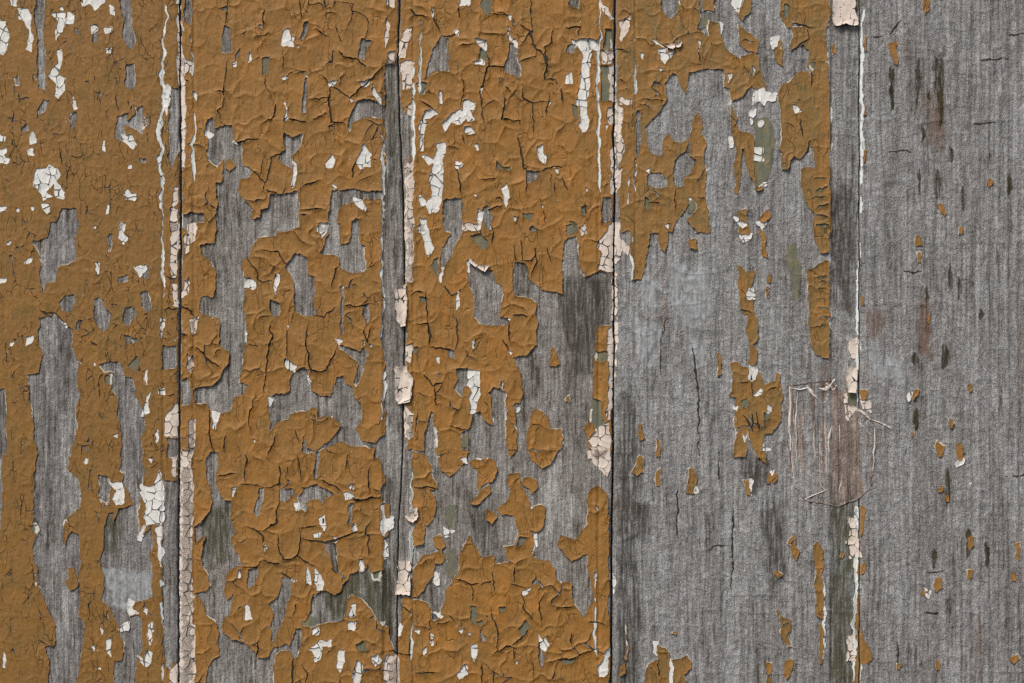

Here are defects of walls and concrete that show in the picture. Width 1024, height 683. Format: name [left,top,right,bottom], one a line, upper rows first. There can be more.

crack [217,57,228,123]
crack [238,0,383,194]
crack [302,180,322,210]
peeling [614,0,833,358]
peeling [852,0,867,213]
peeling [0,0,620,683]
peeling [717,265,783,484]
crack [209,410,382,618]
crack [389,639,437,674]
crack [456,567,605,683]
peeling [645,645,692,683]
peeling [840,506,872,683]